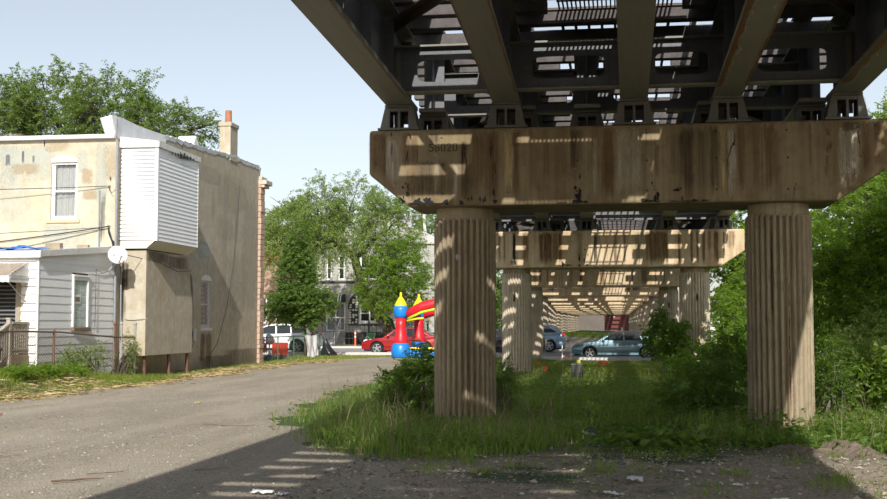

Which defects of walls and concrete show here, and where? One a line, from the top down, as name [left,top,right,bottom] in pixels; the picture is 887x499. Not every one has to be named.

spalling [400,182,448,205]